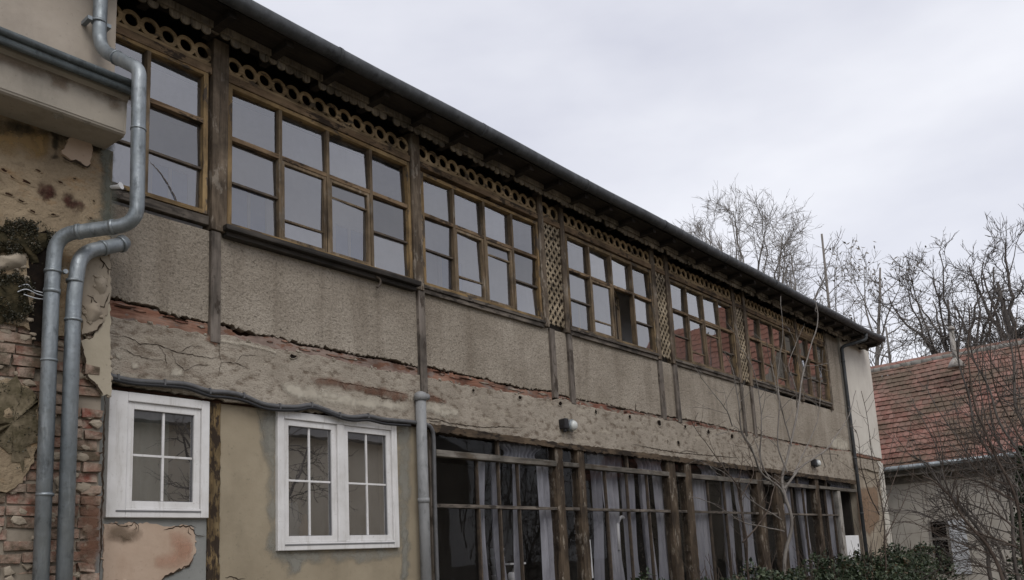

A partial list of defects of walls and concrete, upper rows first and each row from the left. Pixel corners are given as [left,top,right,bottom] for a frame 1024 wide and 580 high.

flaking render [0,137,93,217]
flaking render [0,231,54,412]
flaking render [53,336,64,481]
flaking render [73,256,208,580]
crack [114,336,255,375]
crack [325,379,403,401]
crack [430,396,514,430]
spalling [221,323,883,461]
flaking render [0,449,37,574]